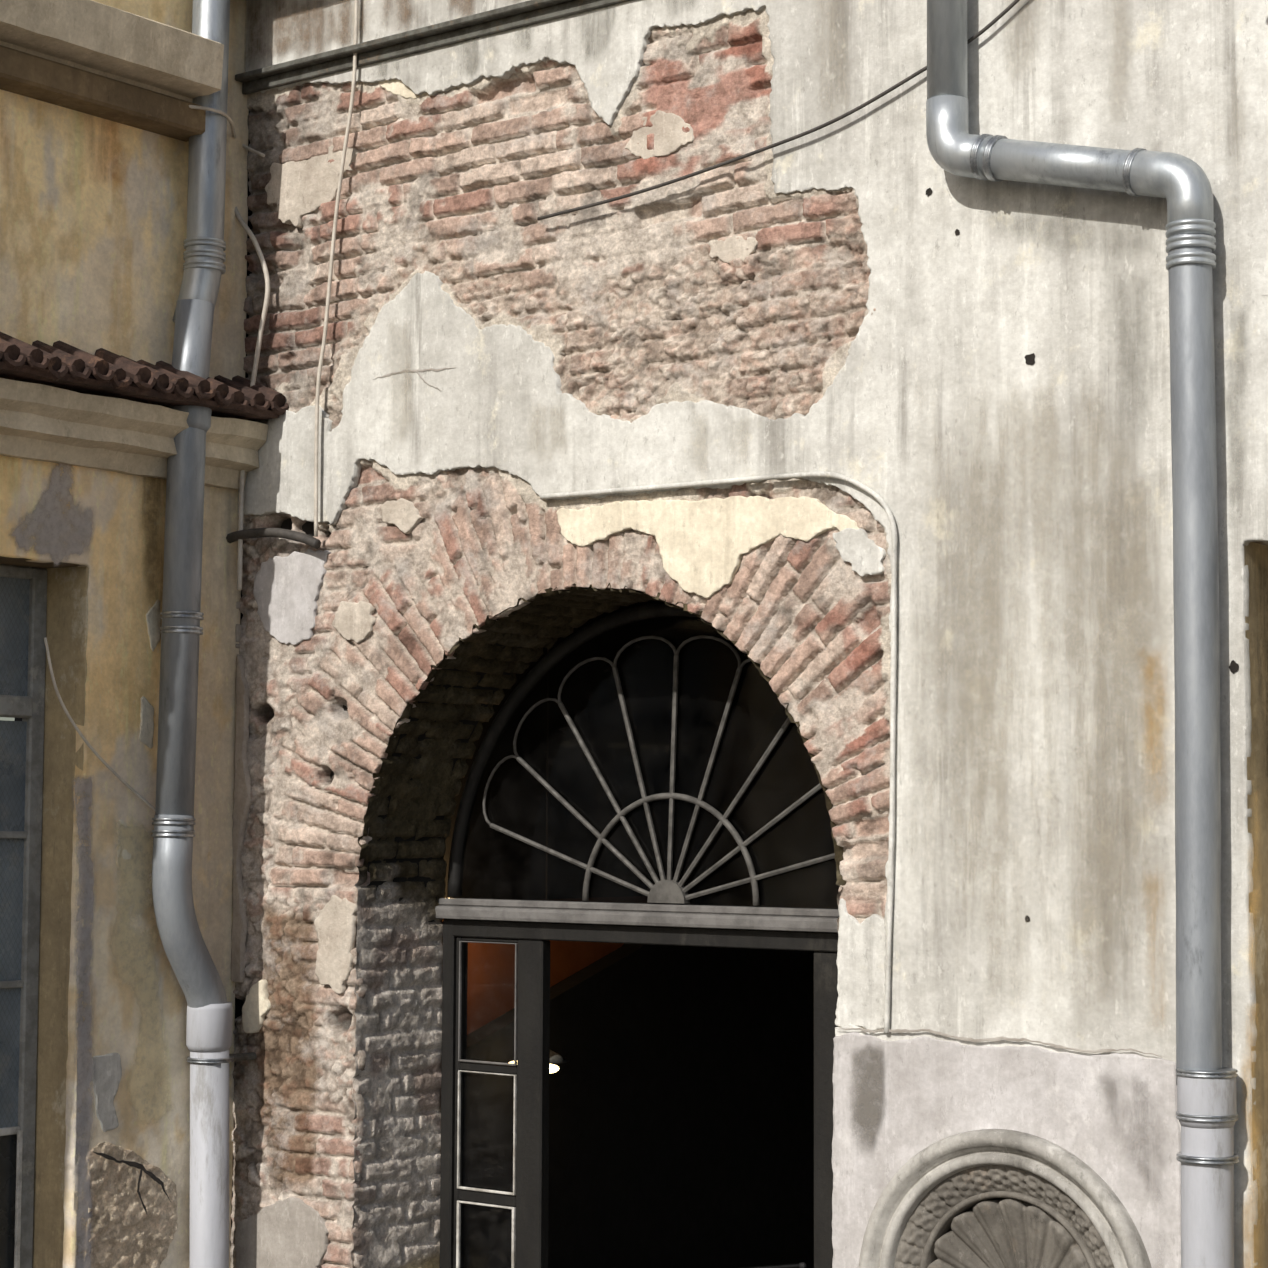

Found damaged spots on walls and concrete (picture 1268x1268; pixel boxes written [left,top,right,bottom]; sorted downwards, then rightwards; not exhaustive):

crack [373,367,456,391]
flaking render [243,7,876,431]
flaking render [74,777,178,1268]
flaking render [230,459,891,1268]